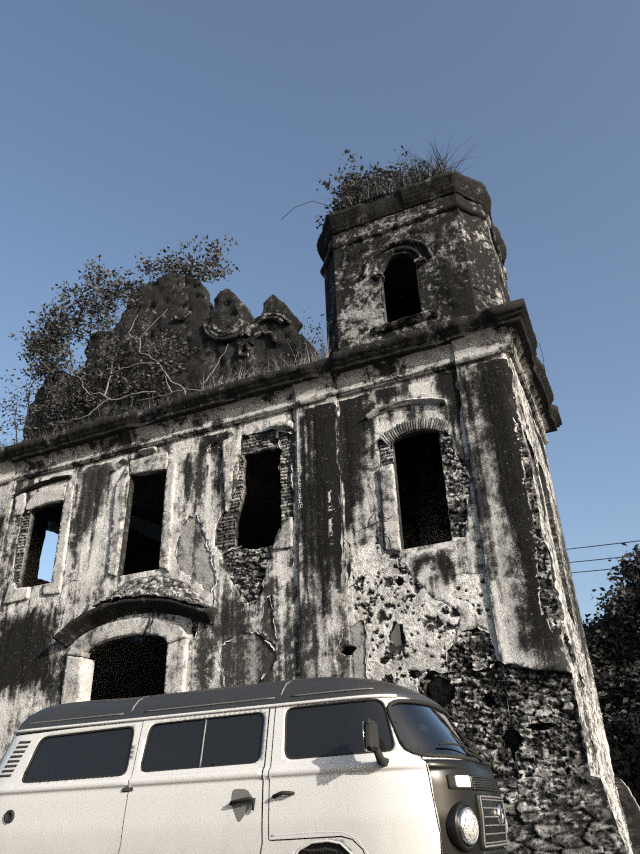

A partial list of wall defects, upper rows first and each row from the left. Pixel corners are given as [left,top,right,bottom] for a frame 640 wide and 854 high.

water stain [0,553,57,699]
water stain [74,462,113,594]
peeling [92,429,295,687]
flaking render [378,436,397,472]
water stain [300,358,562,663]
flaking render [438,431,471,537]
flaking render [335,536,591,779]
flaking render [514,419,562,631]